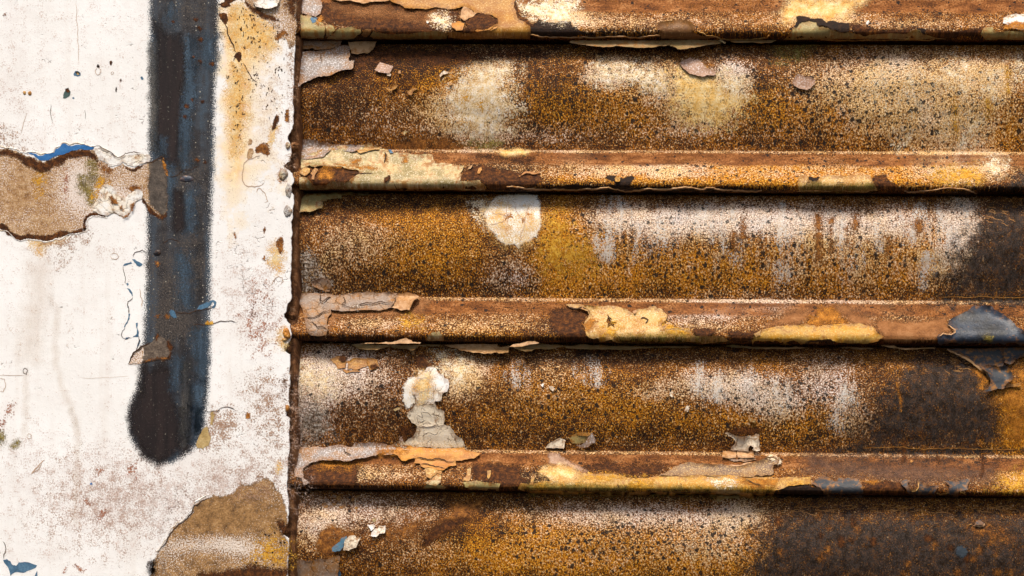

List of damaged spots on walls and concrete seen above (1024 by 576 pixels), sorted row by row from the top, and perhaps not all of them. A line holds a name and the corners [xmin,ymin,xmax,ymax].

corrosion [221,1,297,157]
peeling [219,0,377,159]
peeling [0,142,170,243]
peeling [299,139,545,249]
corrosion [385,133,761,284]
corrosion [546,306,593,344]
corrosion [692,304,953,350]
peeling [150,474,386,576]
peeling [294,331,500,548]
corrosion [582,458,672,479]
peeling [518,418,864,502]
corrosion [774,485,823,498]